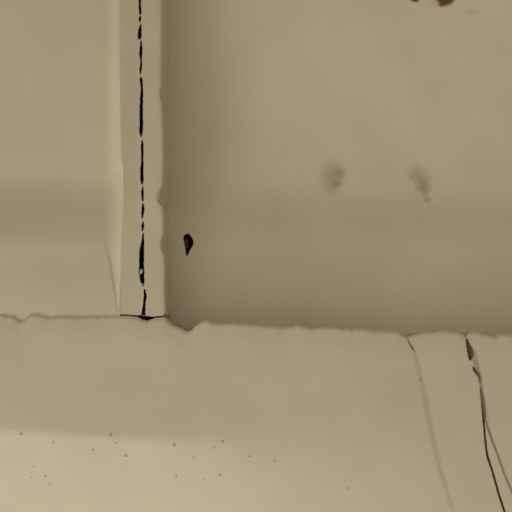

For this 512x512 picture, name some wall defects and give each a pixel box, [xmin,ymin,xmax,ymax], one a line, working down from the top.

crack [138,0,147,315]
crack [466,338,512,512]